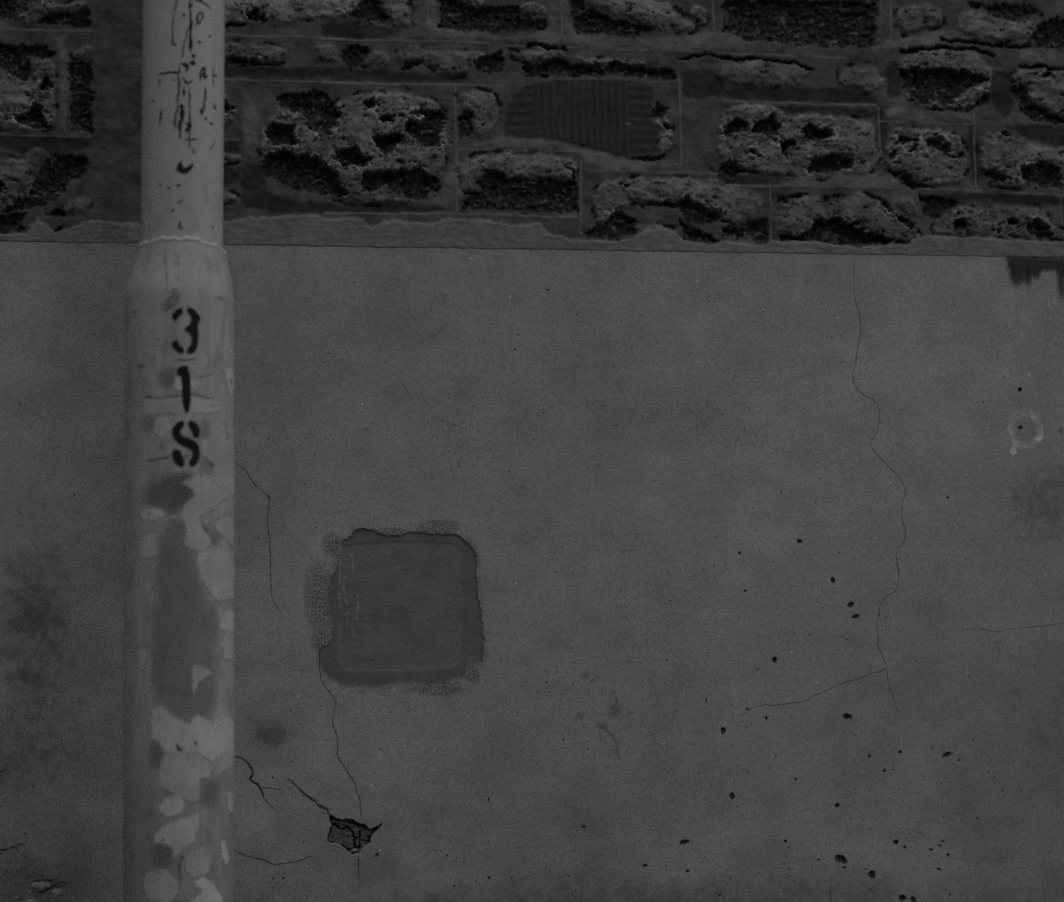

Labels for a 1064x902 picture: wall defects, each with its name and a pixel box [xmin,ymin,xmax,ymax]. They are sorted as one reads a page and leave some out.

peeling [139,434,234,661]
crack [234,461,281,613]
crack [744,264,906,714]
peeling [143,869,178,902]
peeling [150,706,234,902]
crack [234,849,311,865]
crack [234,756,331,815]
crack [319,644,362,818]
flaking render [324,810,382,857]